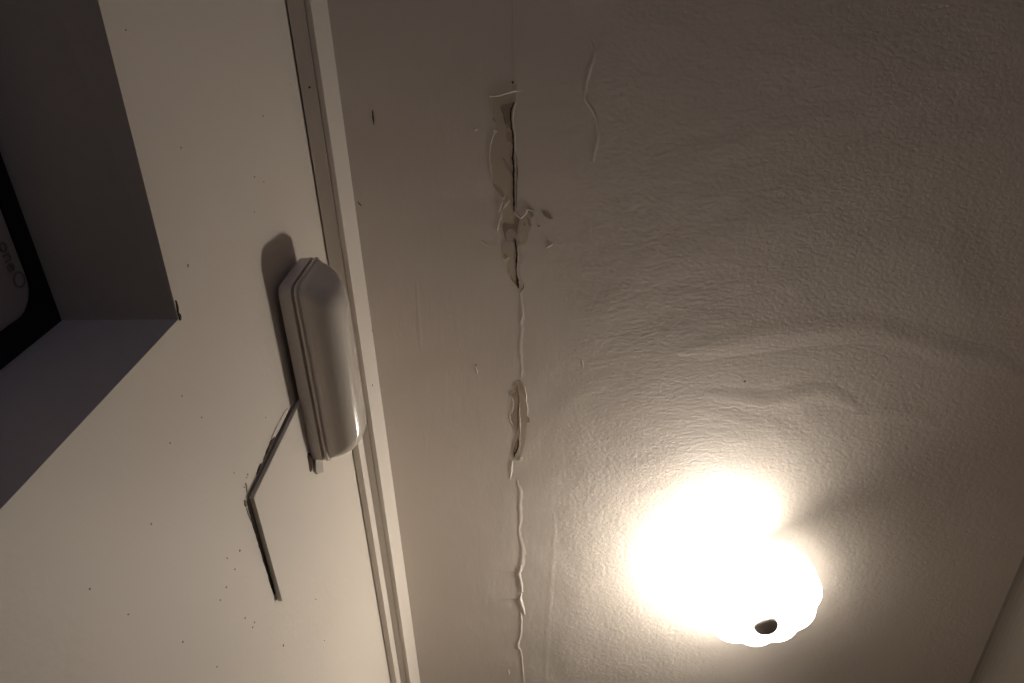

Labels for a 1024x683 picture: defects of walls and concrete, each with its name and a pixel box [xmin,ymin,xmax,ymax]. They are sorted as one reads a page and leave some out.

crack [503,81,518,211]
peeling [489,90,552,292]
crack [514,239,524,292]
crack [512,385,520,457]
spalling [511,381,530,462]
crack [245,411,289,595]